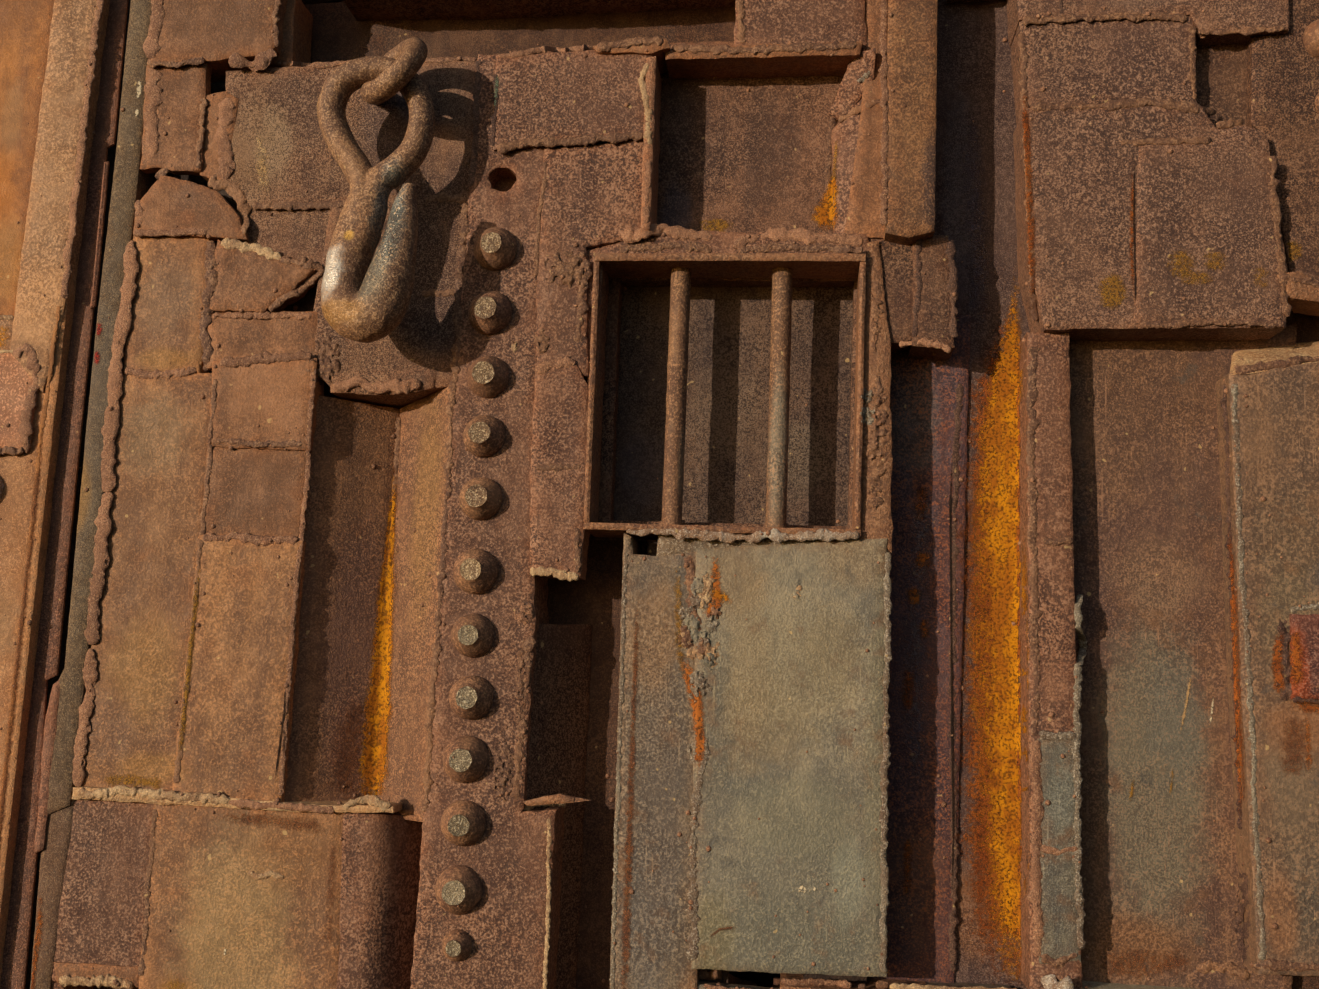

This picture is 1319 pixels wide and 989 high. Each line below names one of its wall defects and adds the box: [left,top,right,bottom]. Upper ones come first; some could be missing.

rust [814,146,838,227]
rust [332,485,398,796]
rust [675,577,705,761]
rust [706,557,729,614]
rust [957,299,1029,975]
rust [1271,632,1303,692]